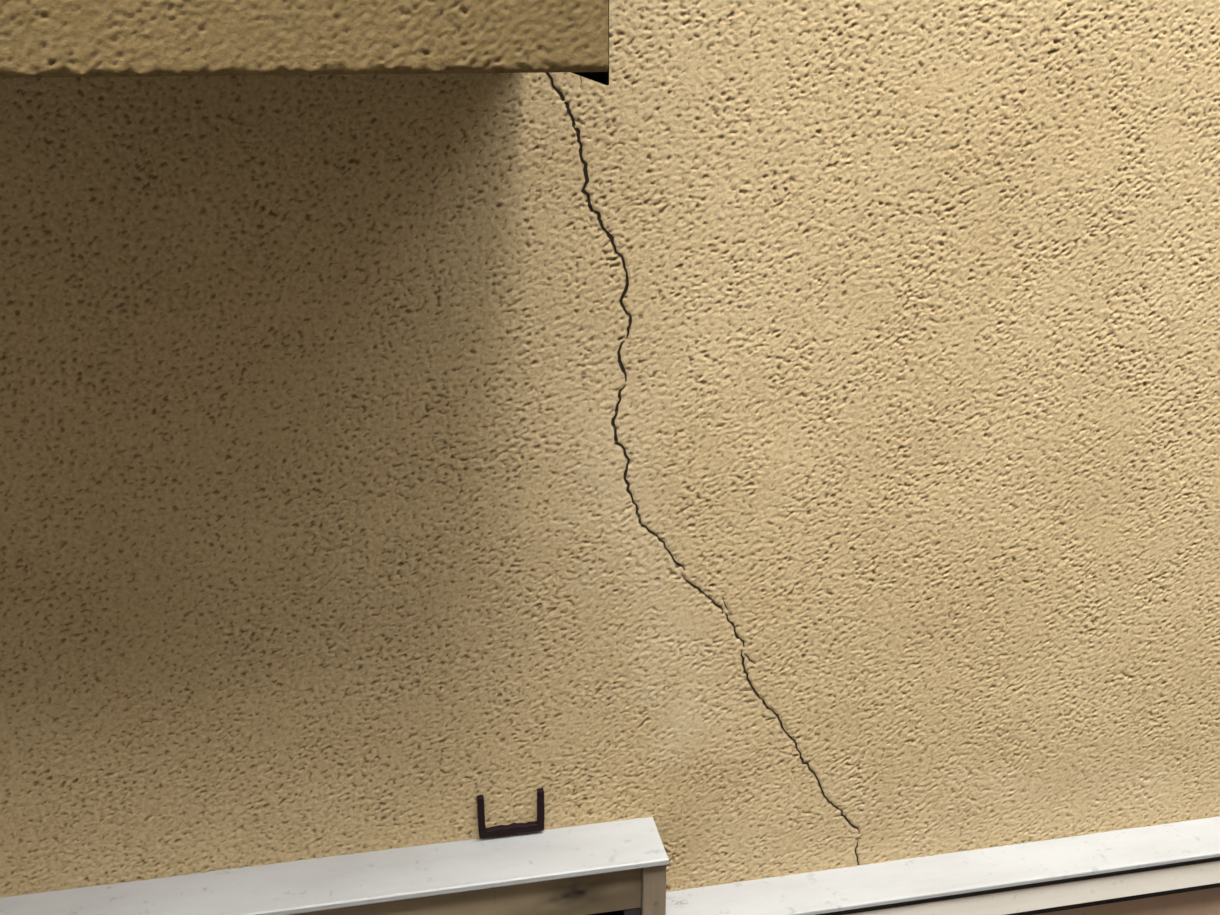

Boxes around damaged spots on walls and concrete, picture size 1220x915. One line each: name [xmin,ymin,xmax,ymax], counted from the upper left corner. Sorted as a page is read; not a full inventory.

crack [546,72,861,866]